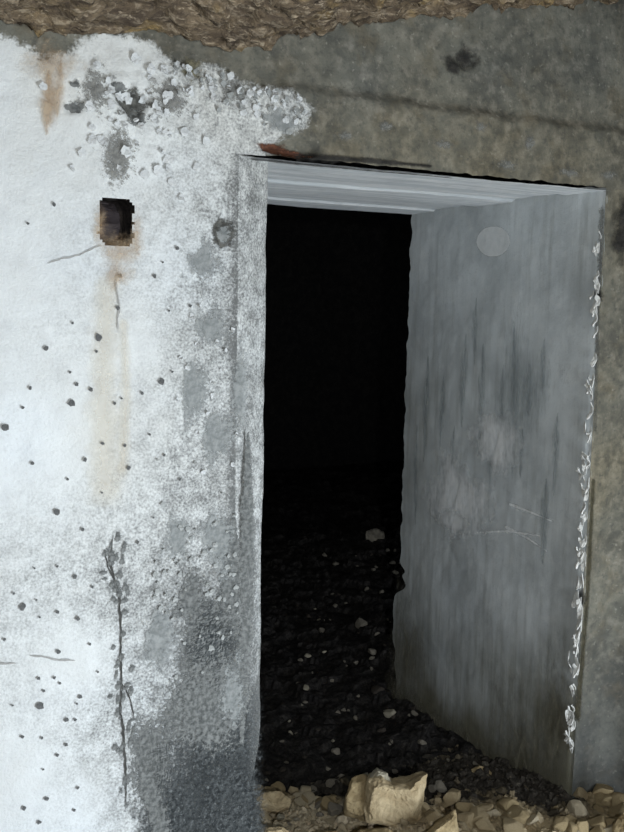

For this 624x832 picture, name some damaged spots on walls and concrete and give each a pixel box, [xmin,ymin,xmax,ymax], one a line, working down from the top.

water stain [69,53,199,201]
corrosion [258,143,432,167]
spalling [564,207,604,753]
crack [100,532,136,807]
water stain [124,432,263,832]